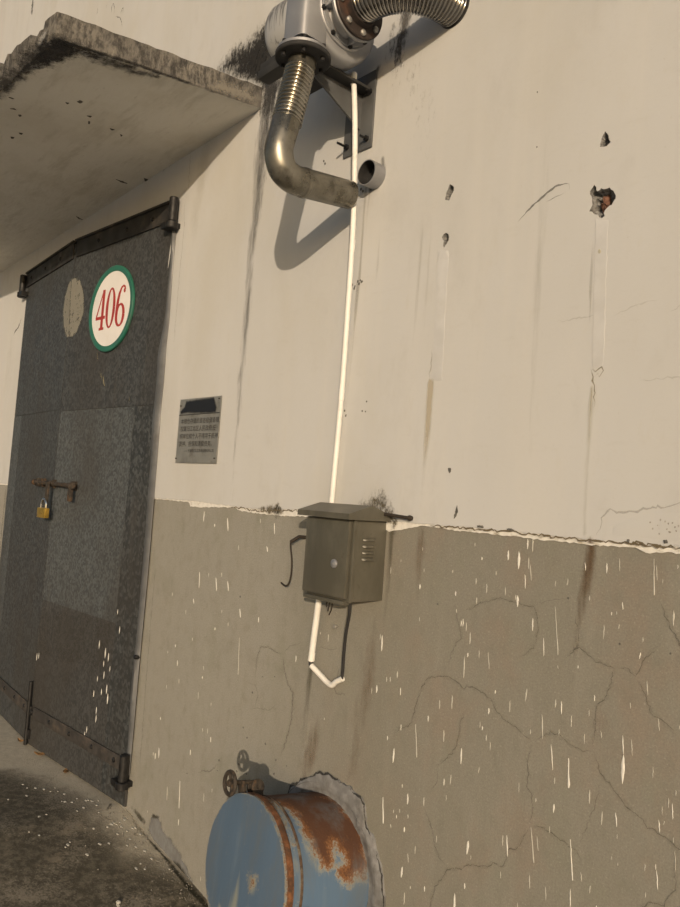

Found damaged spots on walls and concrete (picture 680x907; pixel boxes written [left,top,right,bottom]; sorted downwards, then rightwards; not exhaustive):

leakage [0,32,192,97]
leakage [219,26,279,204]
flaking render [600,131,611,147]
flaking render [590,185,616,218]
rust [584,540,594,590]